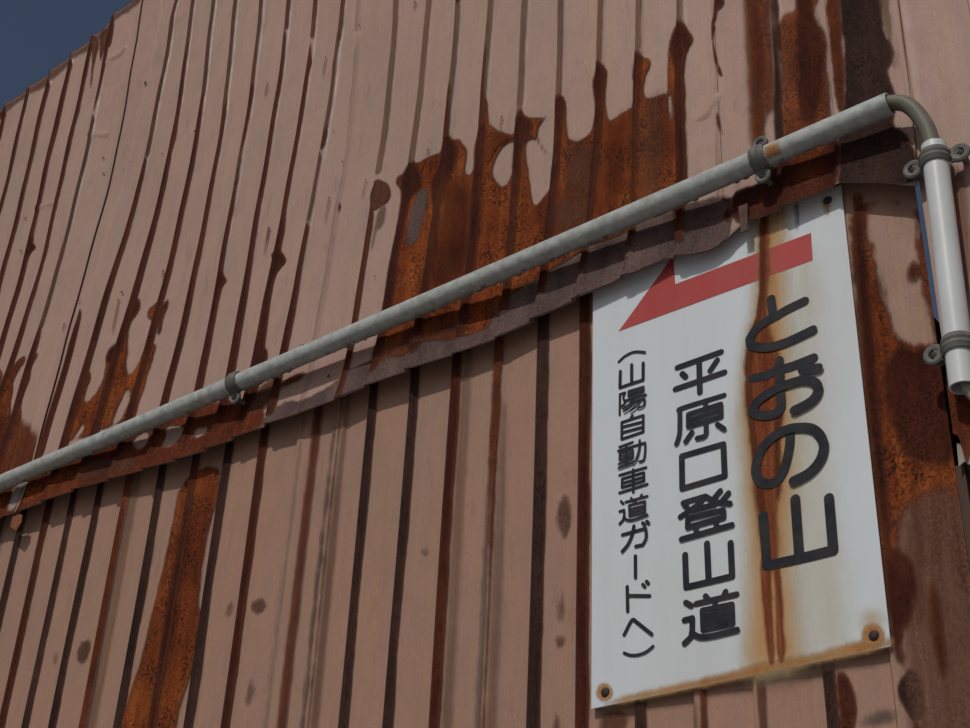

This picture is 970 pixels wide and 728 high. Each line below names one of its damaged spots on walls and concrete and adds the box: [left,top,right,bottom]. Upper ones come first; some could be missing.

corrosion [0,0,140,474]
corrosion [58,0,215,450]
corrosion [159,0,236,407]
corrosion [194,0,262,392]
corrosion [225,0,317,378]
corrosion [279,0,345,355]
corrosion [0,115,917,728]
corrosion [351,0,693,324]
corrosion [711,0,724,75]
corrosion [744,0,895,158]